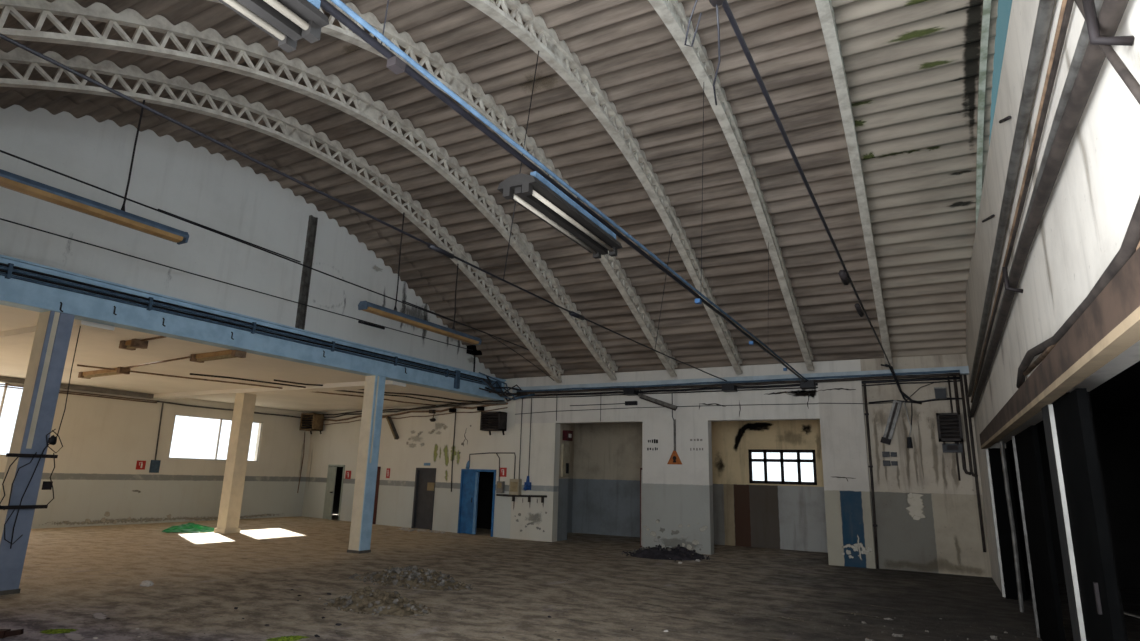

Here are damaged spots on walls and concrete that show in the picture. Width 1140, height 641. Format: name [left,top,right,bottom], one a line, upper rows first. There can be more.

water stain [890,0,983,154]
peeling [906,493,925,520]
peeling [841,534,872,560]